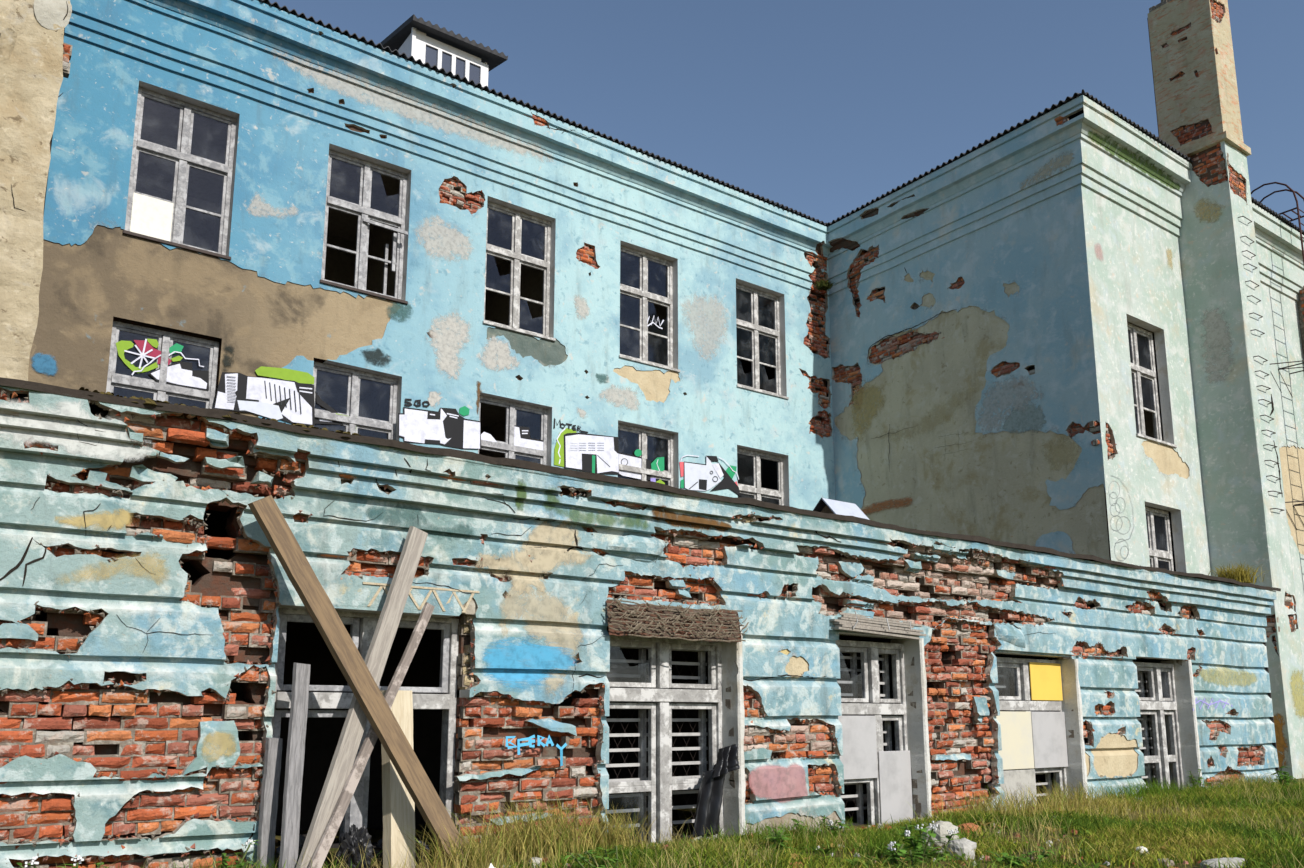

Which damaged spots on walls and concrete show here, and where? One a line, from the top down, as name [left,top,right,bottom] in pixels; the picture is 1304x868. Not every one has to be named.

flaking render [1170,119,1248,201]
crack [0,497,46,586]
peeling [0,225,401,868]
flaking render [414,557,431,578]
flaking render [607,511,780,606]
peeling [747,238,1127,818]
flaking render [448,521,609,861]
flaking render [725,684,843,835]